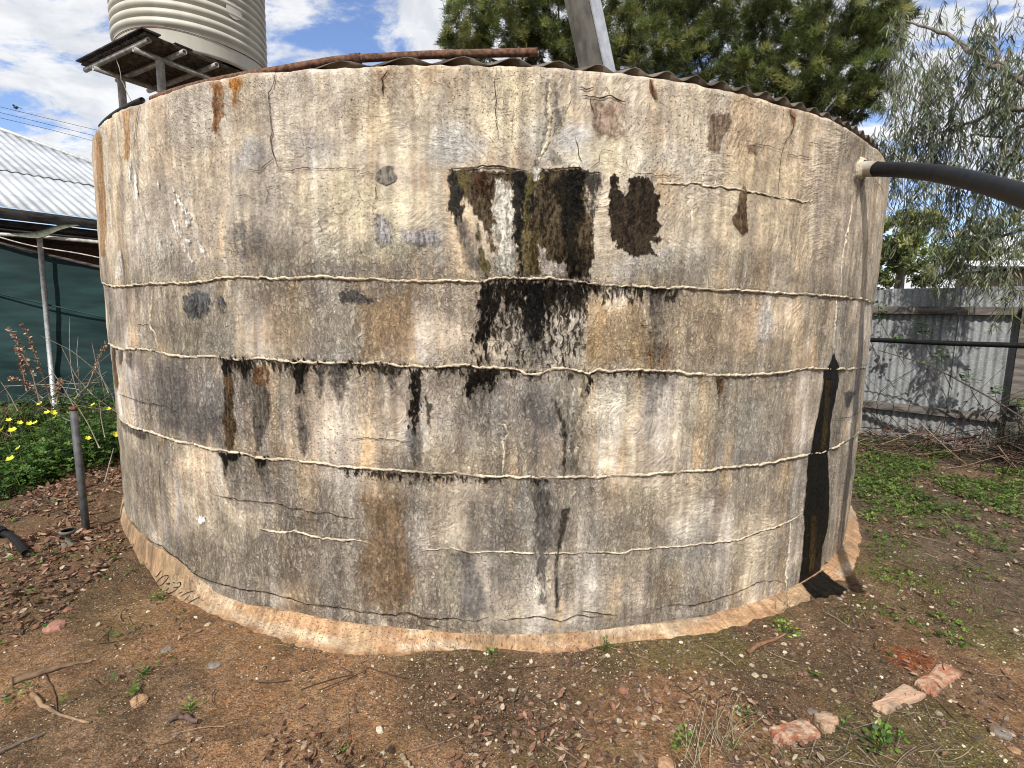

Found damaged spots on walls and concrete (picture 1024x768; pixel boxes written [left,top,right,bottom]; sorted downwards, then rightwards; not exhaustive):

rust [207,77,242,134]
crack [231,72,377,211]
water stain [707,112,732,151]
water stain [732,185,748,235]
water stain [218,78,682,476]
crack [148,539,611,628]
water stain [530,476,570,608]
water stain [799,354,847,599]